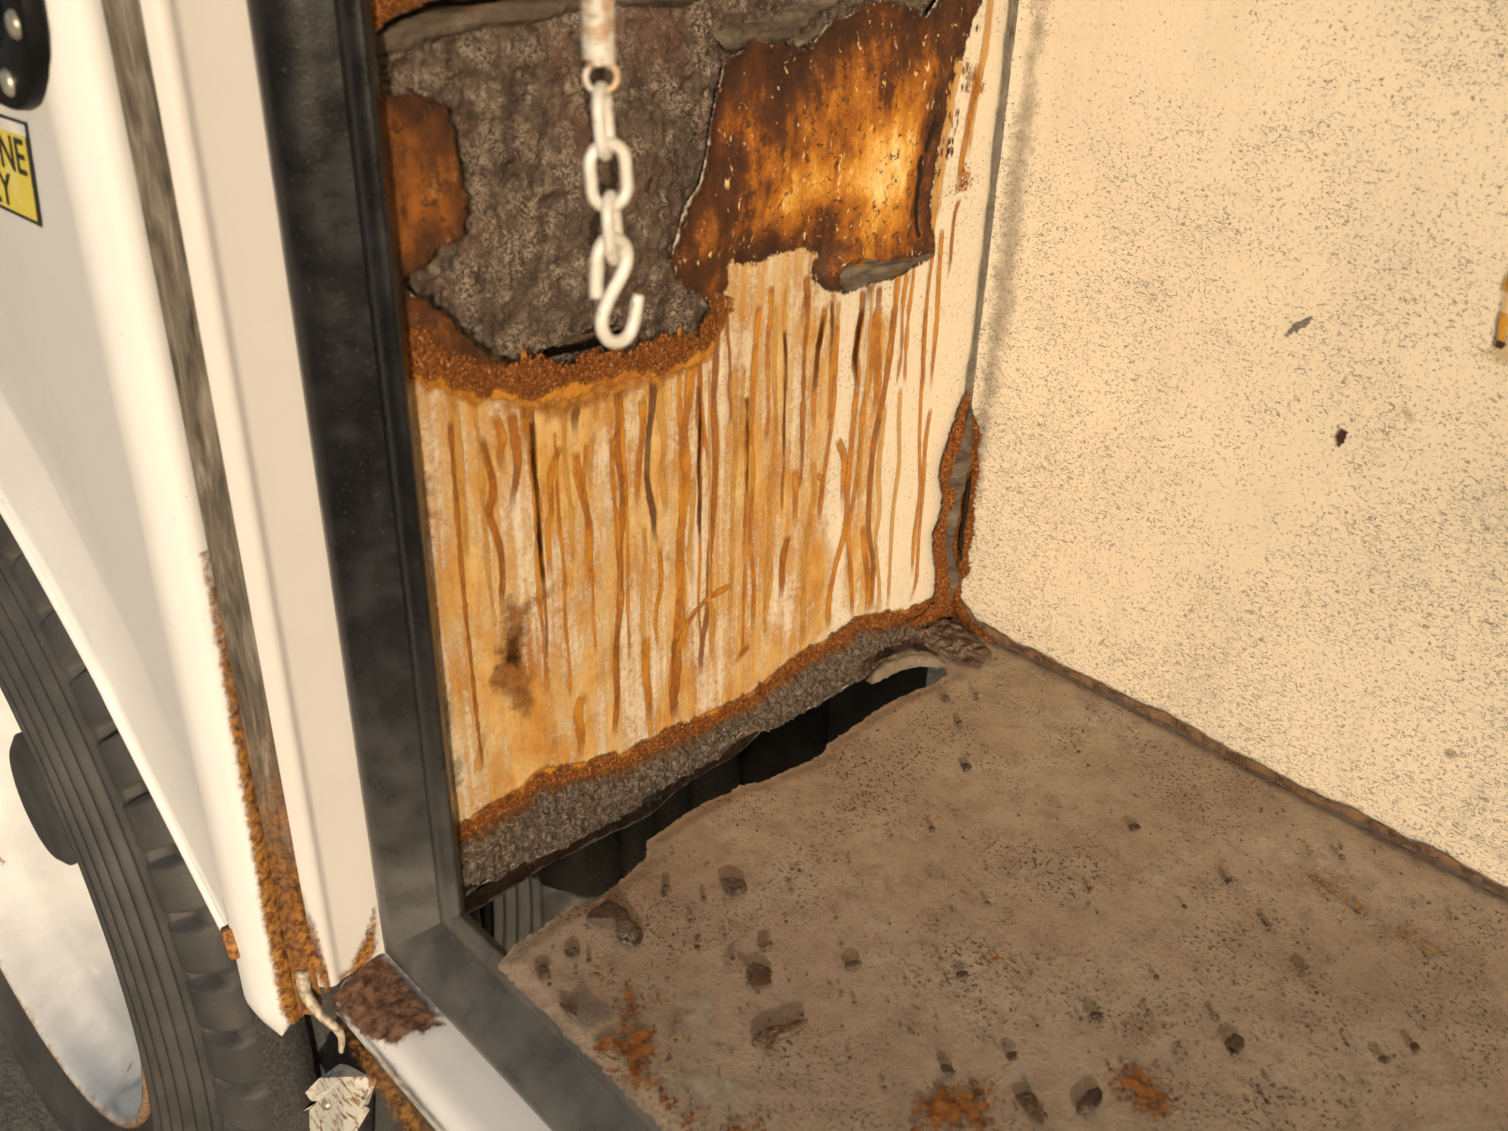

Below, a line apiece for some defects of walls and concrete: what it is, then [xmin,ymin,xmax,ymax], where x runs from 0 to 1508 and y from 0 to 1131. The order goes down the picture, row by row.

corrosion [201,551,445,1131]
corrosion [371,0,1508,917]